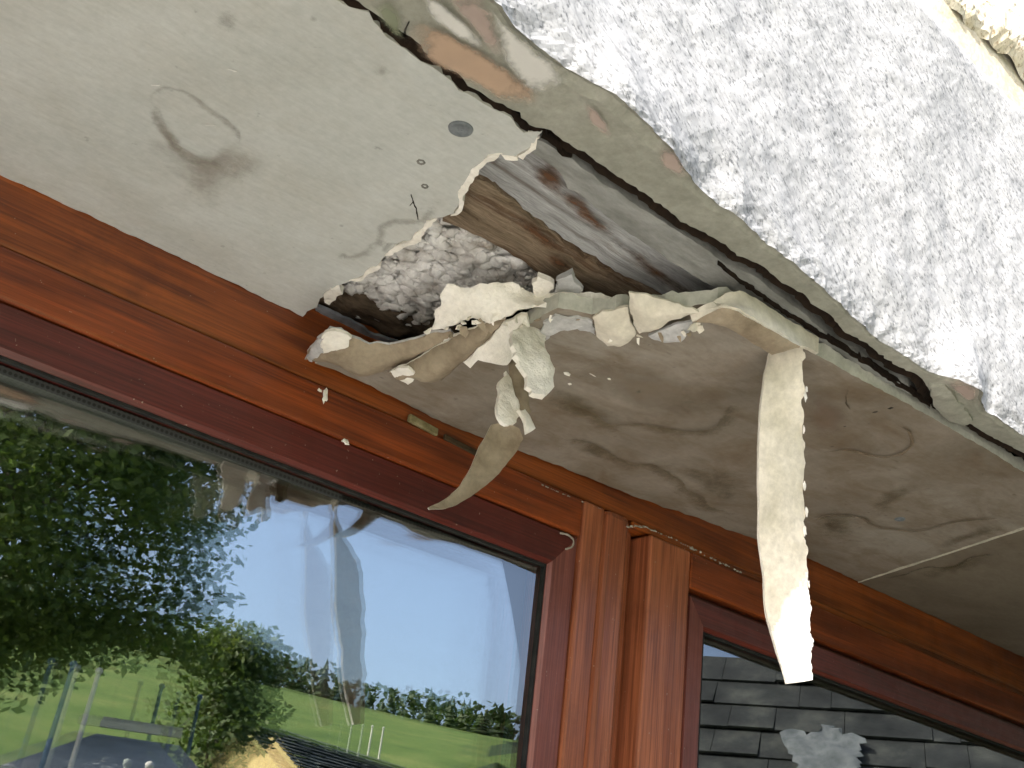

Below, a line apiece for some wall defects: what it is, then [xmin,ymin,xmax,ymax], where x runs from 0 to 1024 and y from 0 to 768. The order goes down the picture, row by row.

spalling [323,218,437,305]
spalling [451,134,540,216]
crack [342,0,936,410]
peeling [305,268,704,510]
peeling [757,348,814,684]
crack [966,424,1024,459]